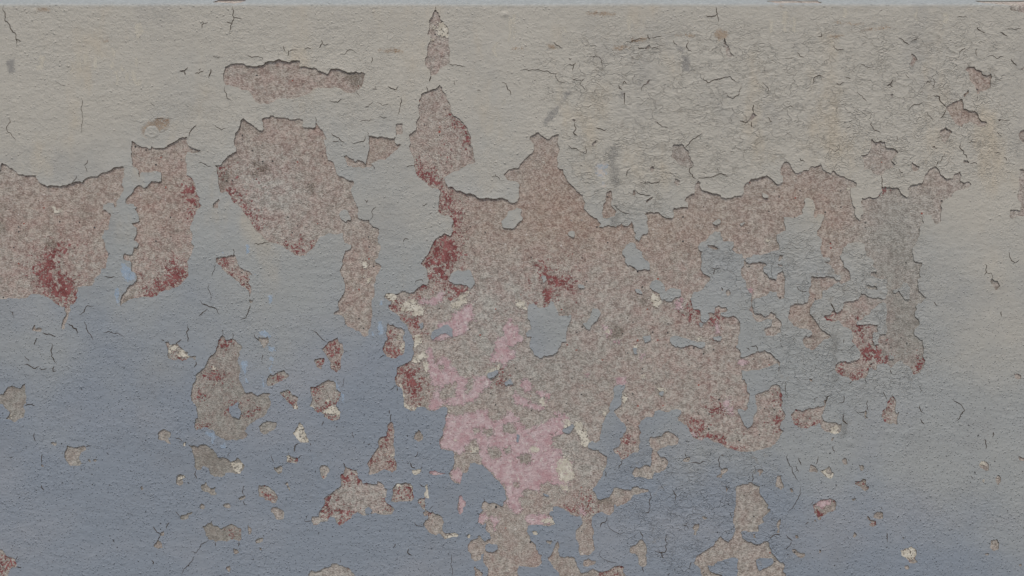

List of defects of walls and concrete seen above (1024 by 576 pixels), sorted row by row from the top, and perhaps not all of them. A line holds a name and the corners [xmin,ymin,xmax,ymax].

crack [703,76,792,127]
crack [786,33,946,118]
crack [616,135,726,214]
peeling [0,137,202,329]
peeling [213,10,971,576]
peeling [166,335,344,440]